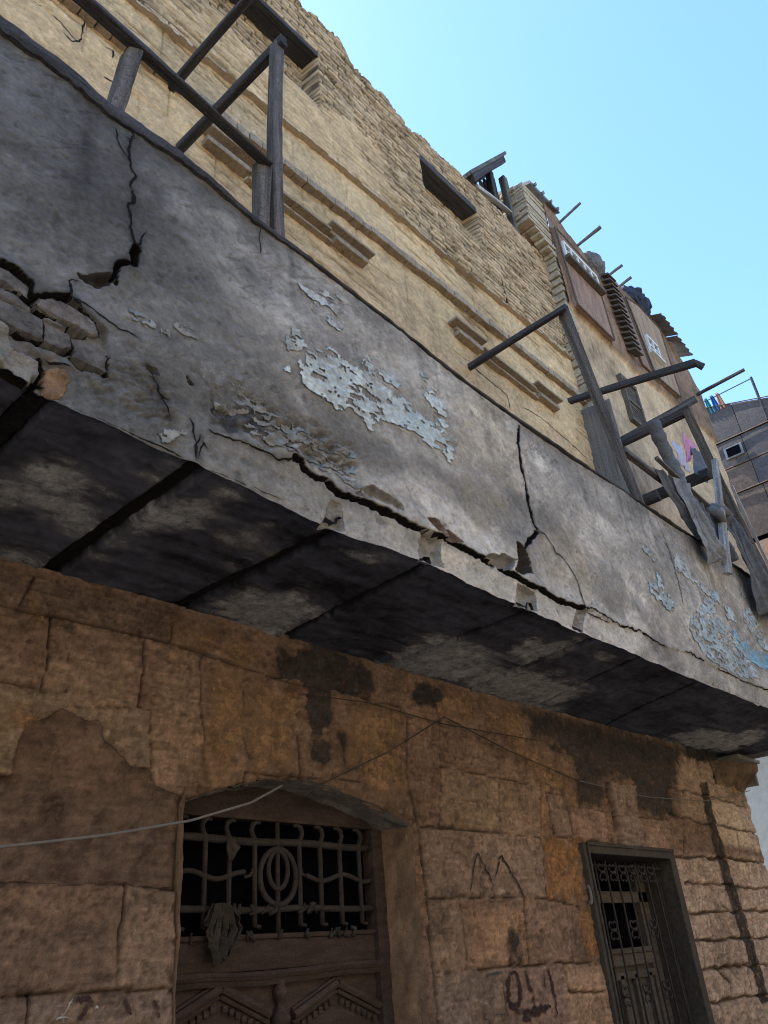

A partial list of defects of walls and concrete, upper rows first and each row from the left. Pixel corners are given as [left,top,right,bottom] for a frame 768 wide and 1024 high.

crack [107,129,147,286]
flaking render [0,268,112,400]
peeling [210,378,404,511]
peeling [283,326,455,465]
leakage [212,589,323,636]
crack [146,366,768,690]
peeling [640,543,675,613]
peeling [674,553,768,680]
leakage [310,732,347,765]
leakage [379,634,766,819]